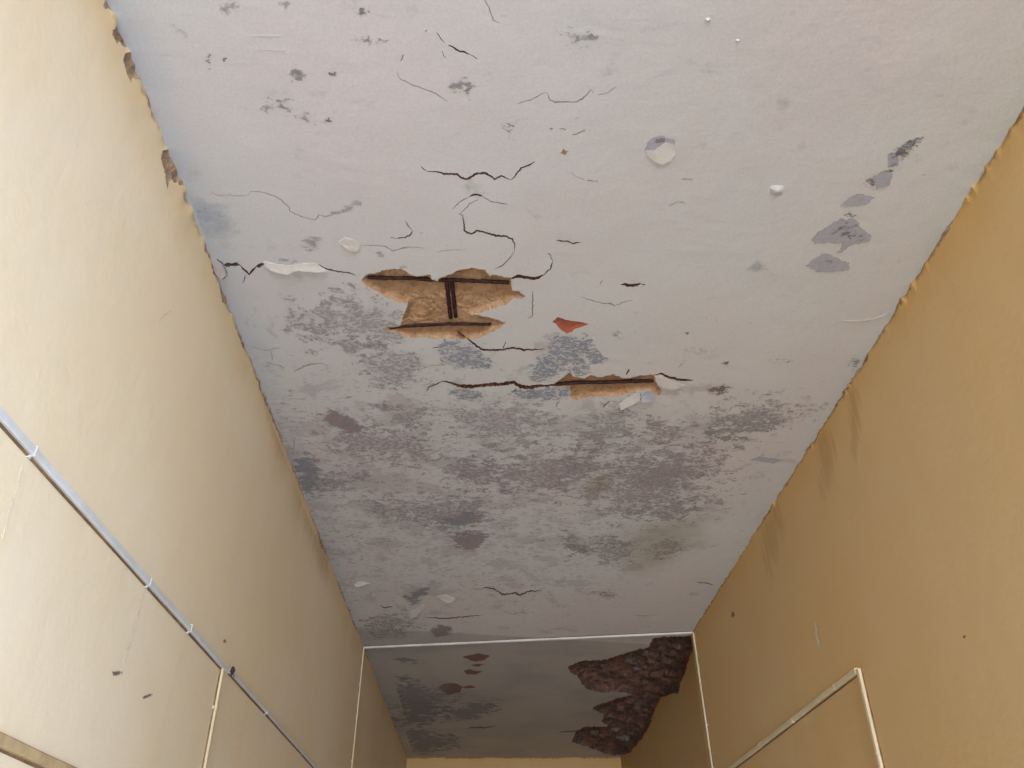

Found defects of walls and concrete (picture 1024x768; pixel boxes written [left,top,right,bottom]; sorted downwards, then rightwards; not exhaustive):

crack [424,30,477,59]
peeling [645,136,676,165]
crack [217,259,264,282]
crack [360,162,581,318]
peeling [806,137,923,272]
spalling [362,267,526,370]
crack [396,331,560,406]
leakage [284,282,827,567]
spalling [509,317,684,410]
crack [603,369,691,410]
leakage [360,588,453,639]
spalling [568,636,693,756]